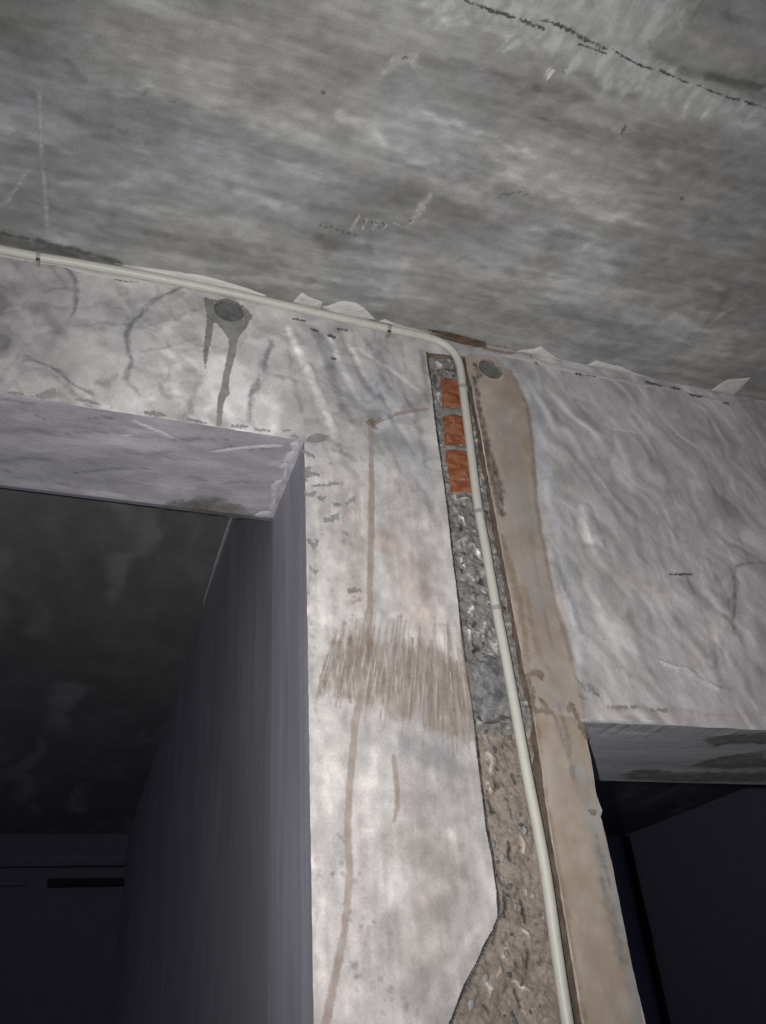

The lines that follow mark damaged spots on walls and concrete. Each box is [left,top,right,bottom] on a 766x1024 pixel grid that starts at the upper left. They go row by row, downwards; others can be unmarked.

crack [424,0,766,121]
water stain [203,297,252,426]
peeling [293,292,428,333]
peeling [490,345,751,404]
spalling [212,429,356,523]
water stain [323,611,472,734]
spalling [426,352,573,1024]